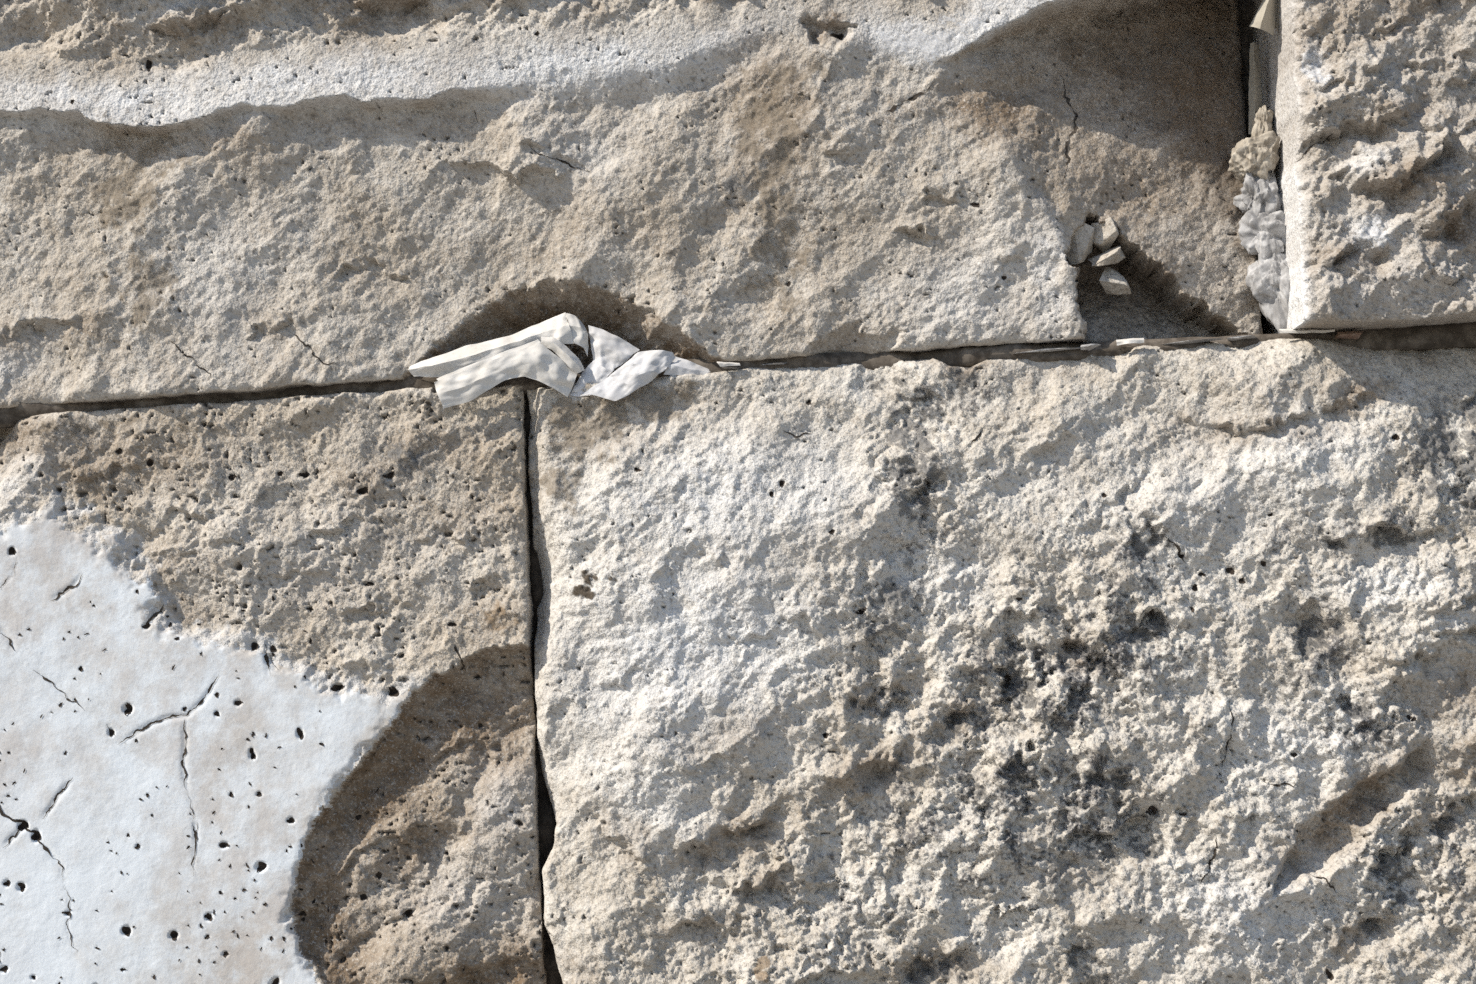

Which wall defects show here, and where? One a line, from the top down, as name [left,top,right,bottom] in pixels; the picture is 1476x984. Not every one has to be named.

crack [1061,76,1078,184]
spalling [908,0,1263,354]
crack [51,575,82,601]
crack [145,604,164,625]
crack [1,633,219,876]
crack [0,779,75,949]